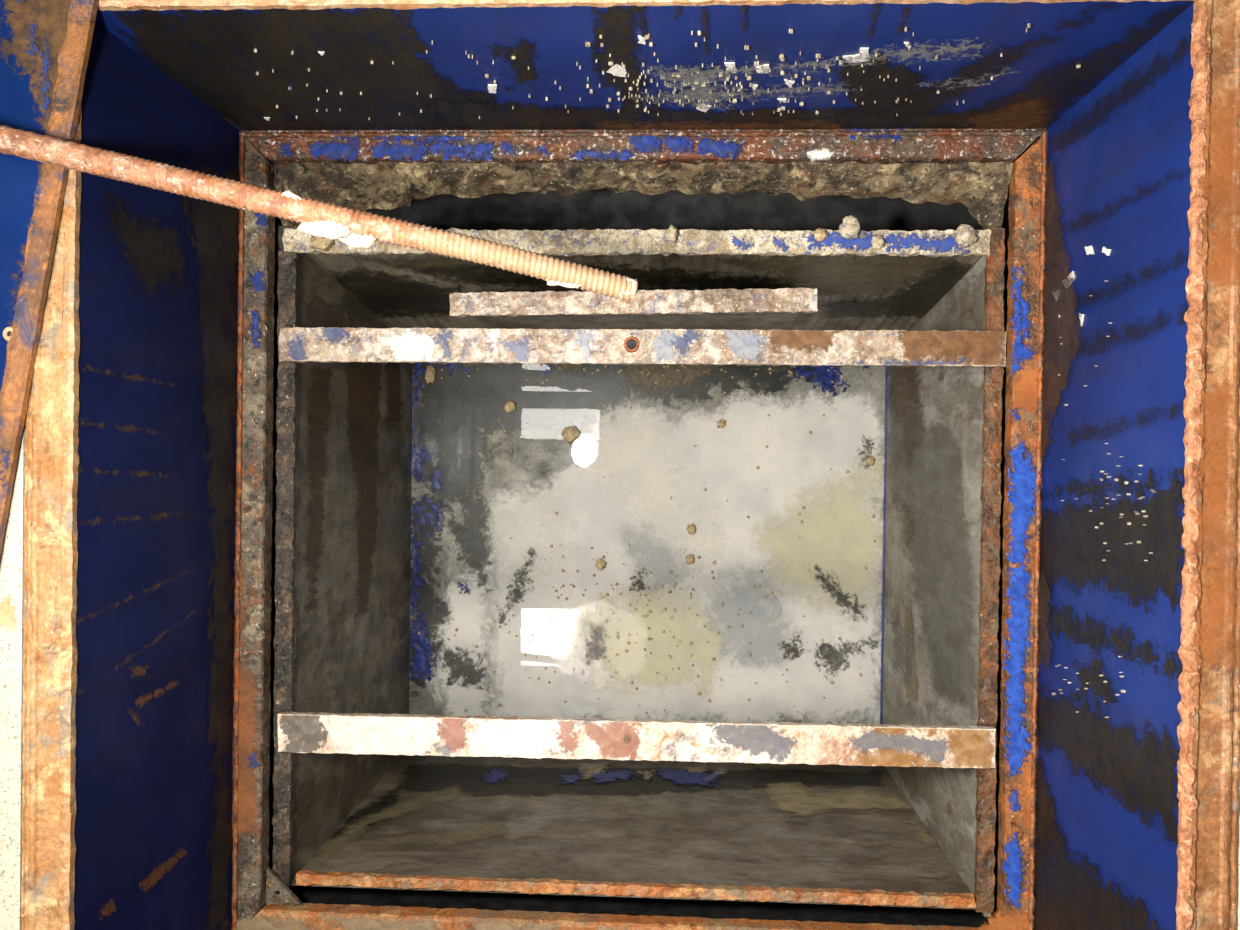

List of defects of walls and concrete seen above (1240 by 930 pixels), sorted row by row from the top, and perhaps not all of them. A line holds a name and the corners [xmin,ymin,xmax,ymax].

corrosion [0,0,71,135]
leakage [425,4,1192,149]
peeling [773,230,970,254]
corrosion [3,326,13,341]
peeling [1010,265,1035,376]
corrosion [1012,150,1082,466]
leakage [1066,307,1187,356]
corrosion [347,362,402,617]
leakage [1041,467,1184,502]
peeling [1003,441,1037,812]
leakage [1046,597,1183,711]
peeling [1002,831,1026,911]